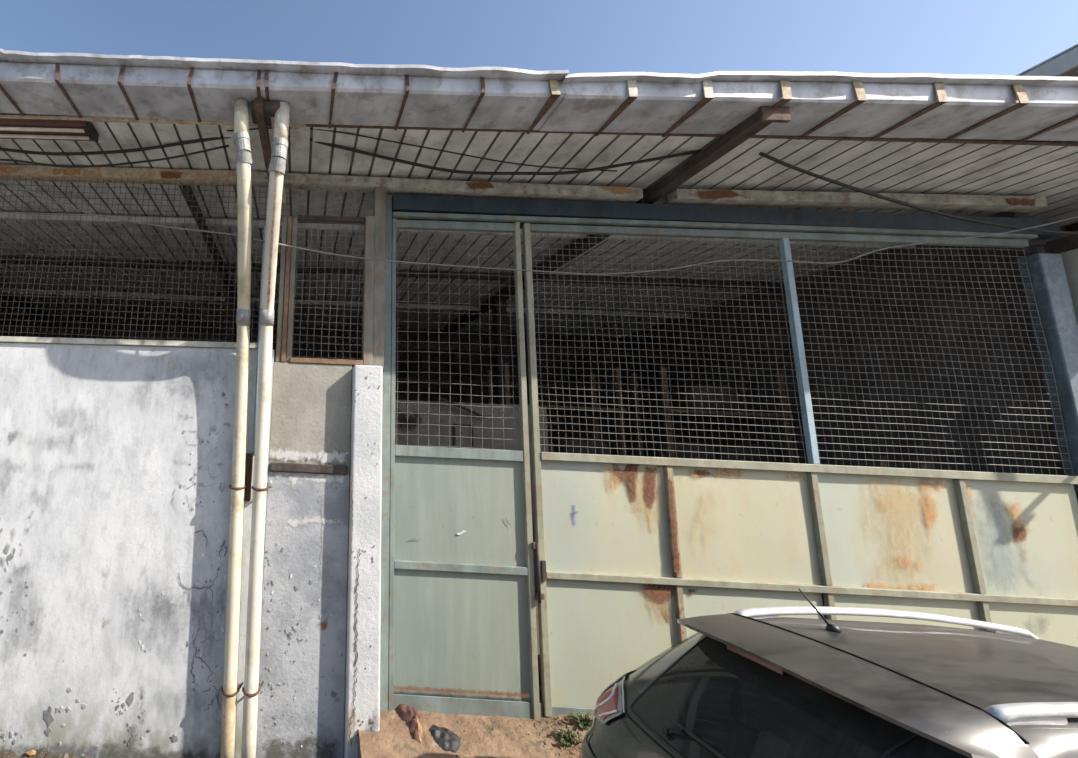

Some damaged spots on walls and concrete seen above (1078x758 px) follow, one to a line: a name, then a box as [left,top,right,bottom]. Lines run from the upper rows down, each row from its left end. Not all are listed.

peeling [267,448,348,487]
peeling [271,516,344,528]
corrosion [612,464,680,573]
crack [178,530,227,720]
crack [348,477,360,742]
corrosion [643,585,673,622]
water stain [101,744,206,758]